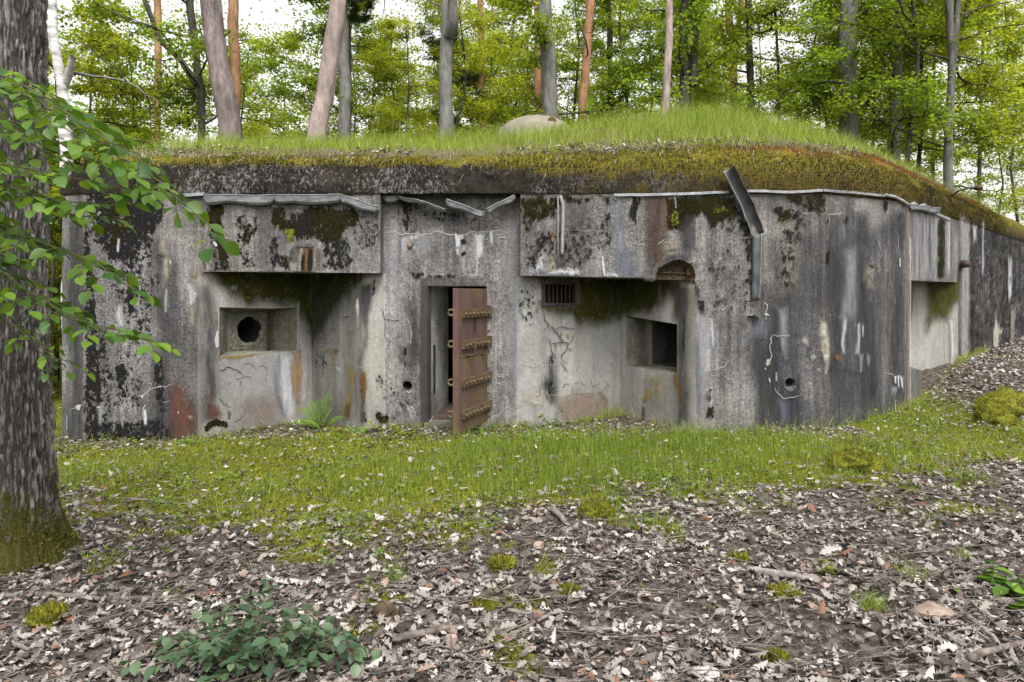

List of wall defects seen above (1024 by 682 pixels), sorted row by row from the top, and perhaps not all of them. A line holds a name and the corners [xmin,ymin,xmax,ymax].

corrosion [298,248,318,271]
damp [757,208,984,428]
crack [139,363,271,421]
corrosion [293,351,302,409]
corrosion [345,367,367,422]
crack [495,310,611,405]